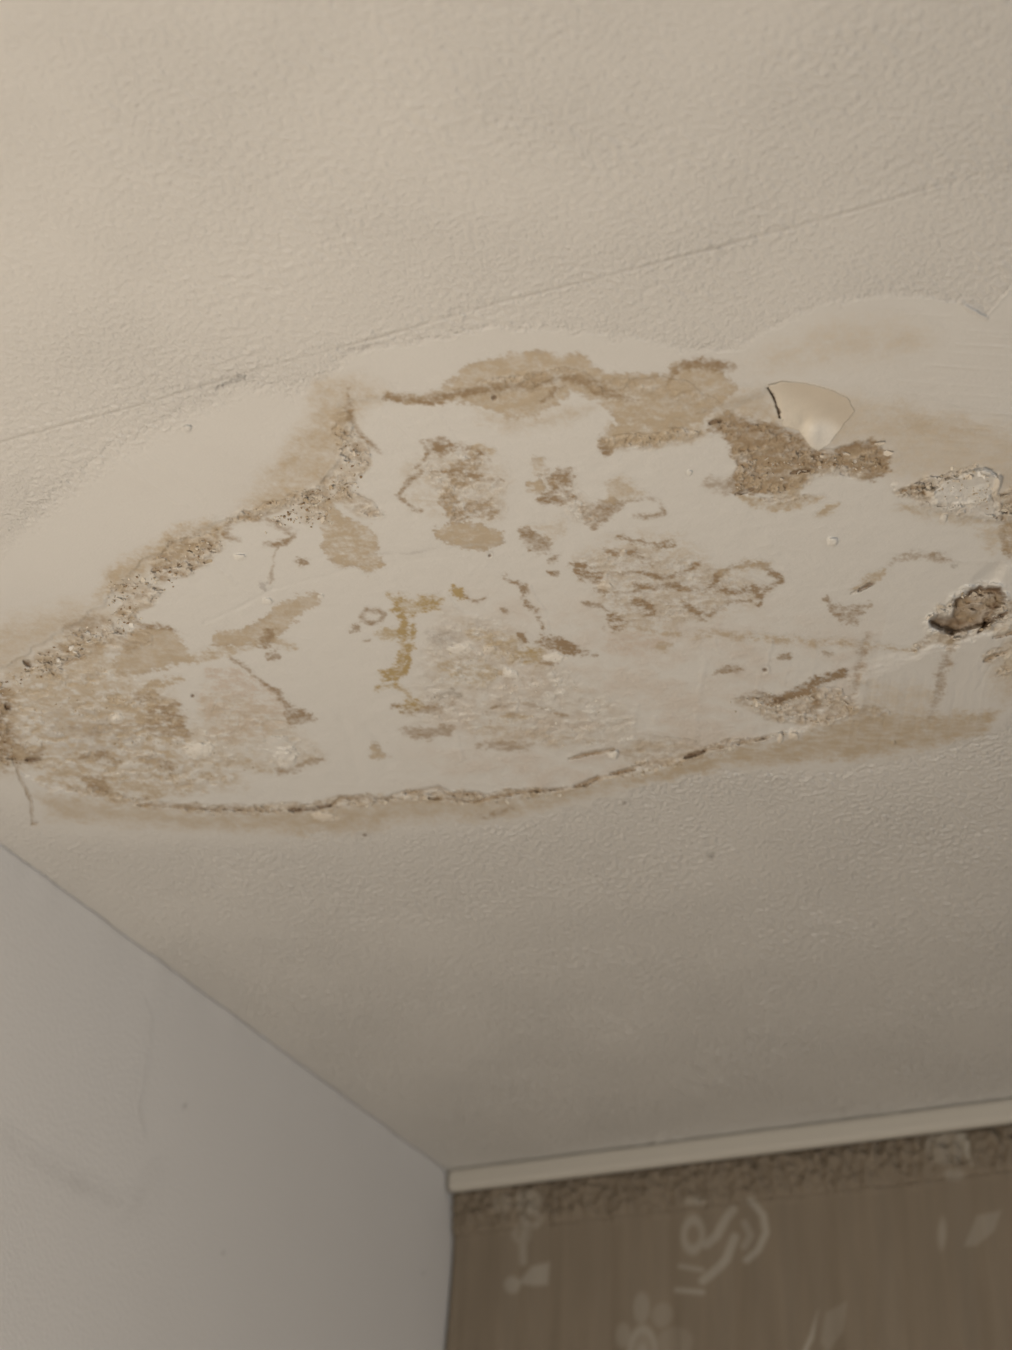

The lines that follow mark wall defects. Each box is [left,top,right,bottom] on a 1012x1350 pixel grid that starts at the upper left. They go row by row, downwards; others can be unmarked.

water stain [0,305,1012,842]
spalling [0,367,1012,815]